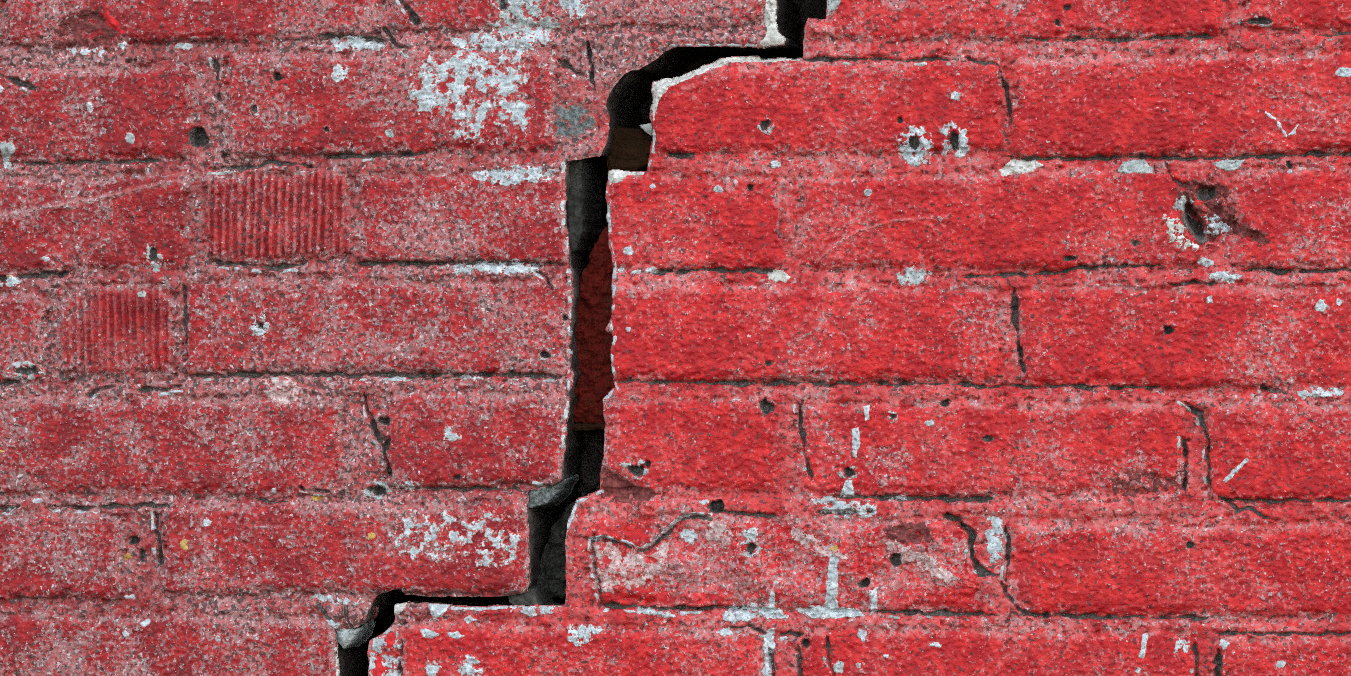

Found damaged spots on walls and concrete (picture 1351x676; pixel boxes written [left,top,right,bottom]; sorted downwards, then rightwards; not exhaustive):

peeling [404,0,597,146]
spalling [1162,158,1274,304]
crack [310,0,841,676]